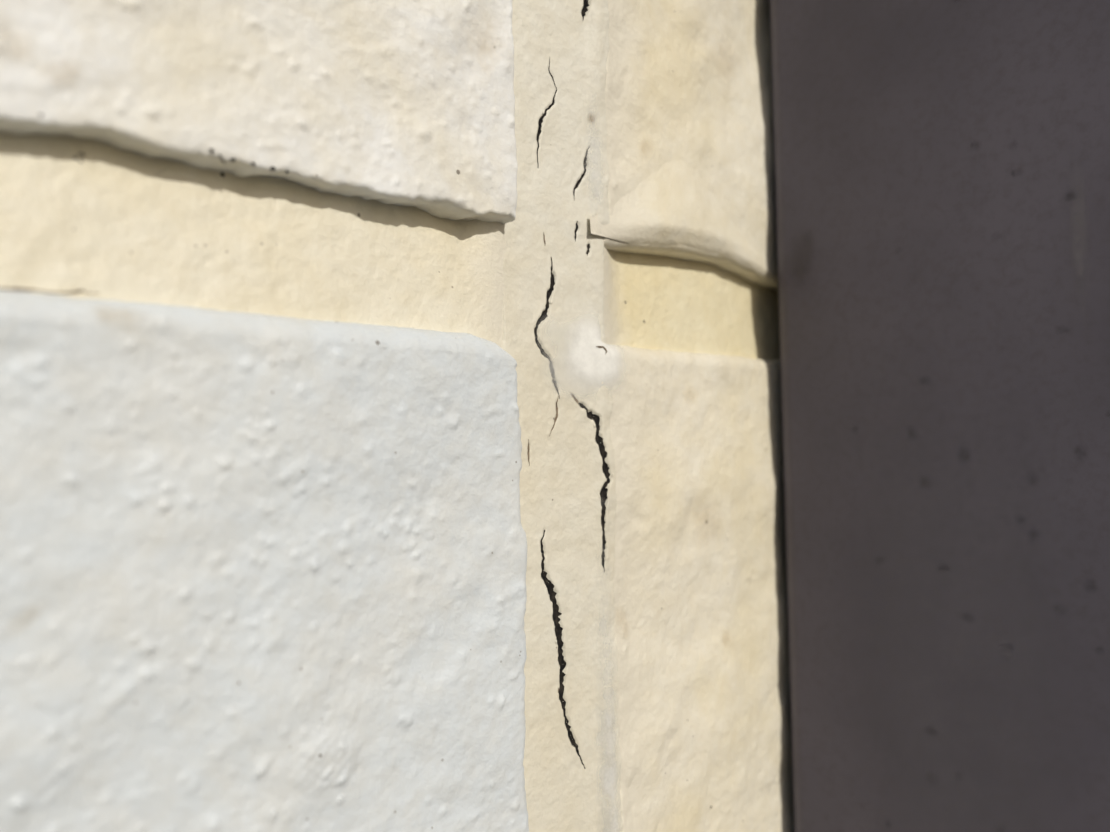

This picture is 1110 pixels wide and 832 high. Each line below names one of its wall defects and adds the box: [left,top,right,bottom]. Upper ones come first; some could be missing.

crack [536,57,557,166]
crack [573,146,590,256]
crack [528,232,613,573]
crack [540,530,585,769]